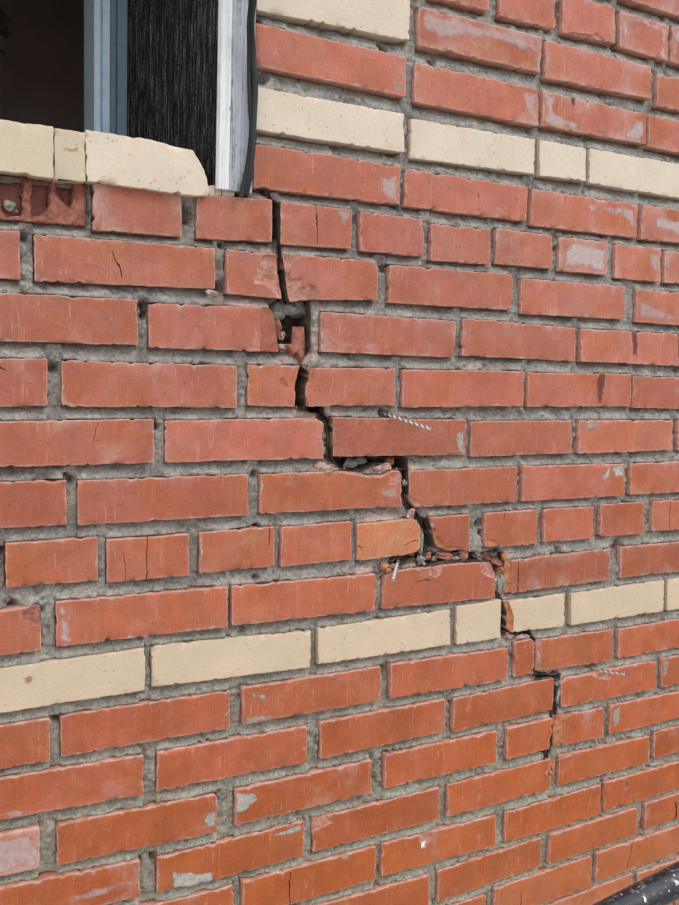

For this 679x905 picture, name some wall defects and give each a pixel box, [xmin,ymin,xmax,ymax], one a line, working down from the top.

crack [1,200,19,213]
crack [259,189,561,777]
spalling [432,527,464,551]
spalling [428,565,443,577]